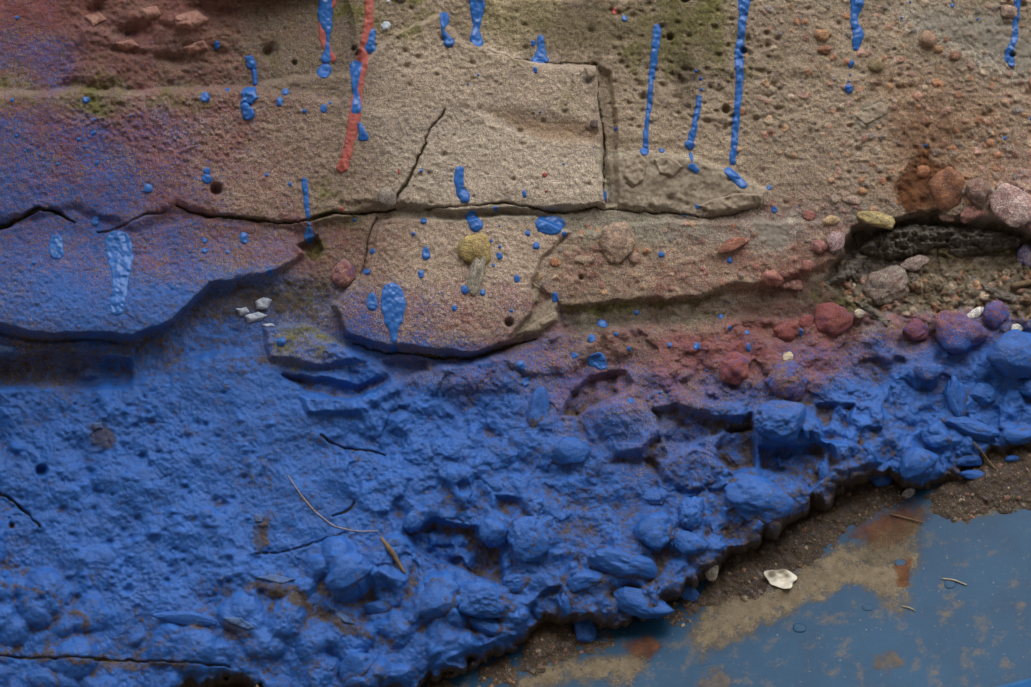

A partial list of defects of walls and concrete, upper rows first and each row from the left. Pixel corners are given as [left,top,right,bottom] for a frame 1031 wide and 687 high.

crack [429,43,748,219]
crack [99,110,445,262]
crack [0,208,74,230]
crack [0,488,39,527]
crack [8,649,229,667]